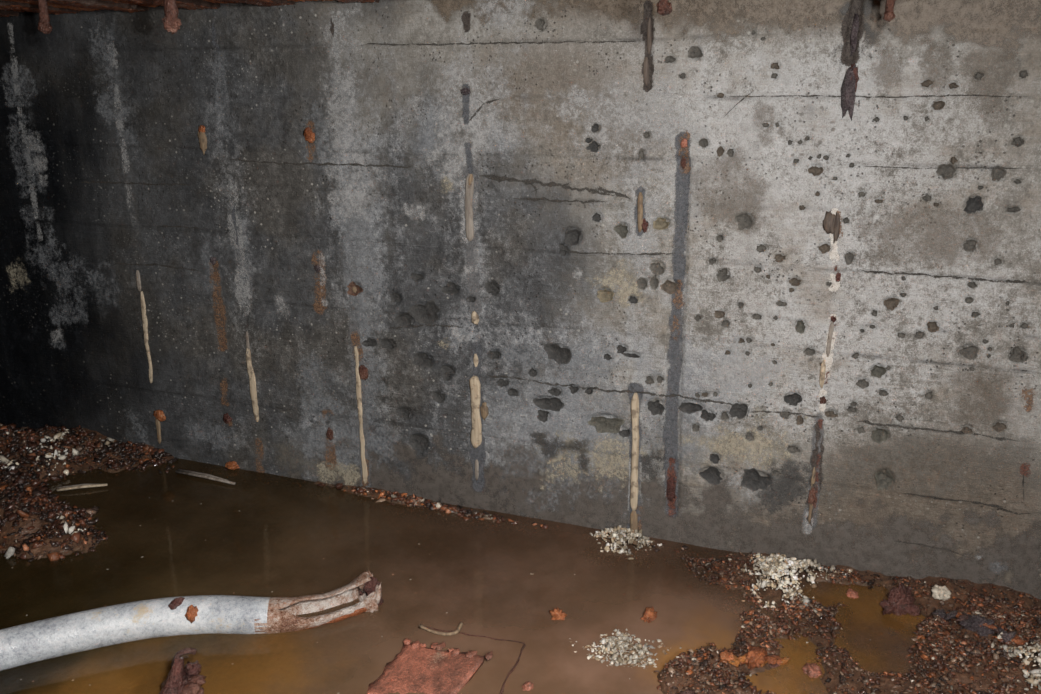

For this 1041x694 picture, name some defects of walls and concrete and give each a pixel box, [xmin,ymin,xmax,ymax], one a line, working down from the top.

crack [723,90,1025,118]
leakage [324,72,373,218]
leakage [427,63,514,206]
crack [481,174,630,204]
crack [487,374,819,418]
rust [666,458,677,516]
rust [802,414,824,533]